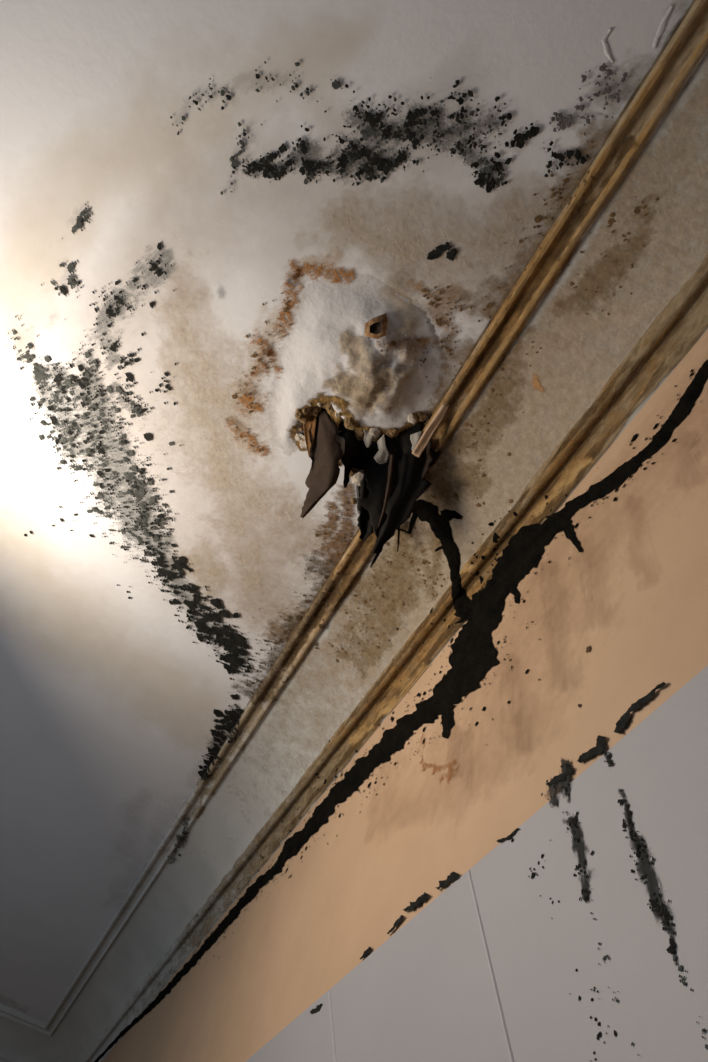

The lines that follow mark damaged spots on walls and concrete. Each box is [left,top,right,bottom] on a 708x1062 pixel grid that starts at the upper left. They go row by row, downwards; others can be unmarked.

damp [8,61,708,781]
spalling [291,402,449,568]
crack [94,359,708,1062]
rust [182,253,708,949]
rust [289,0,708,481]
damp [541,682,666,920]
damp [617,789,692,991]